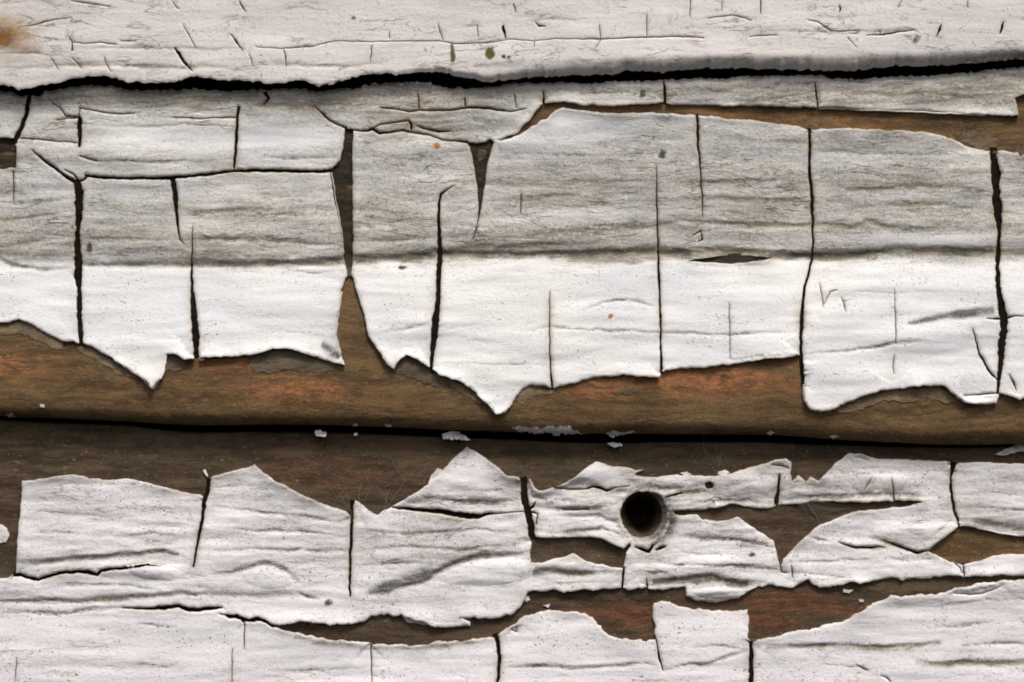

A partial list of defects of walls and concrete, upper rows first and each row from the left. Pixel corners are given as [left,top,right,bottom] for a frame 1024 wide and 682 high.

crack [12,91,332,359]
crack [429,187,452,374]
peeling [0,67,1024,445]
crack [655,172,663,374]
crack [799,86,845,387]
crack [965,147,1024,396]
crack [13,563,157,581]
crack [127,604,268,664]
crack [192,478,211,567]
crack [347,500,355,597]
crack [392,476,628,540]
peeling [0,421,1024,682]